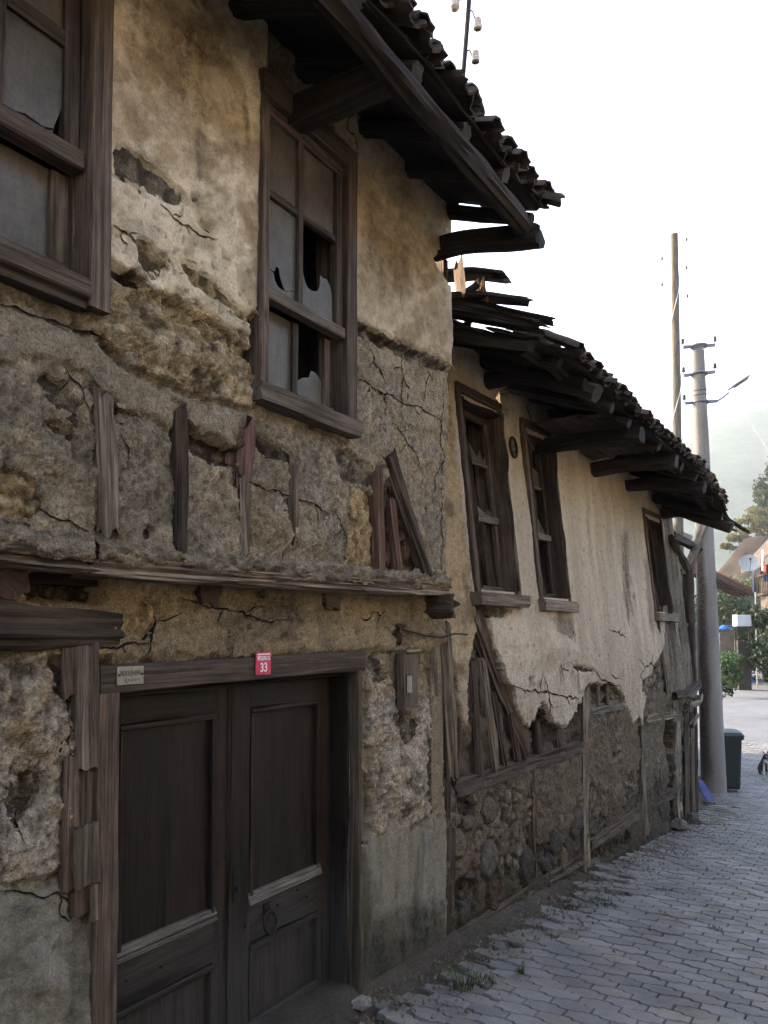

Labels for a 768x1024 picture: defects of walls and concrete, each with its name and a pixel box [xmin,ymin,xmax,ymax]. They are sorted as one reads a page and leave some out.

spalling [112,147,198,205]
crack [160,204,218,240]
spalling [136,239,259,359]
crack [358,348,445,574]
crack [104,597,290,659]
spalling [46,660,61,695]
spalling [530,703,549,727]
crack [513,654,657,714]
spalling [585,684,626,708]
spalling [642,673,659,695]